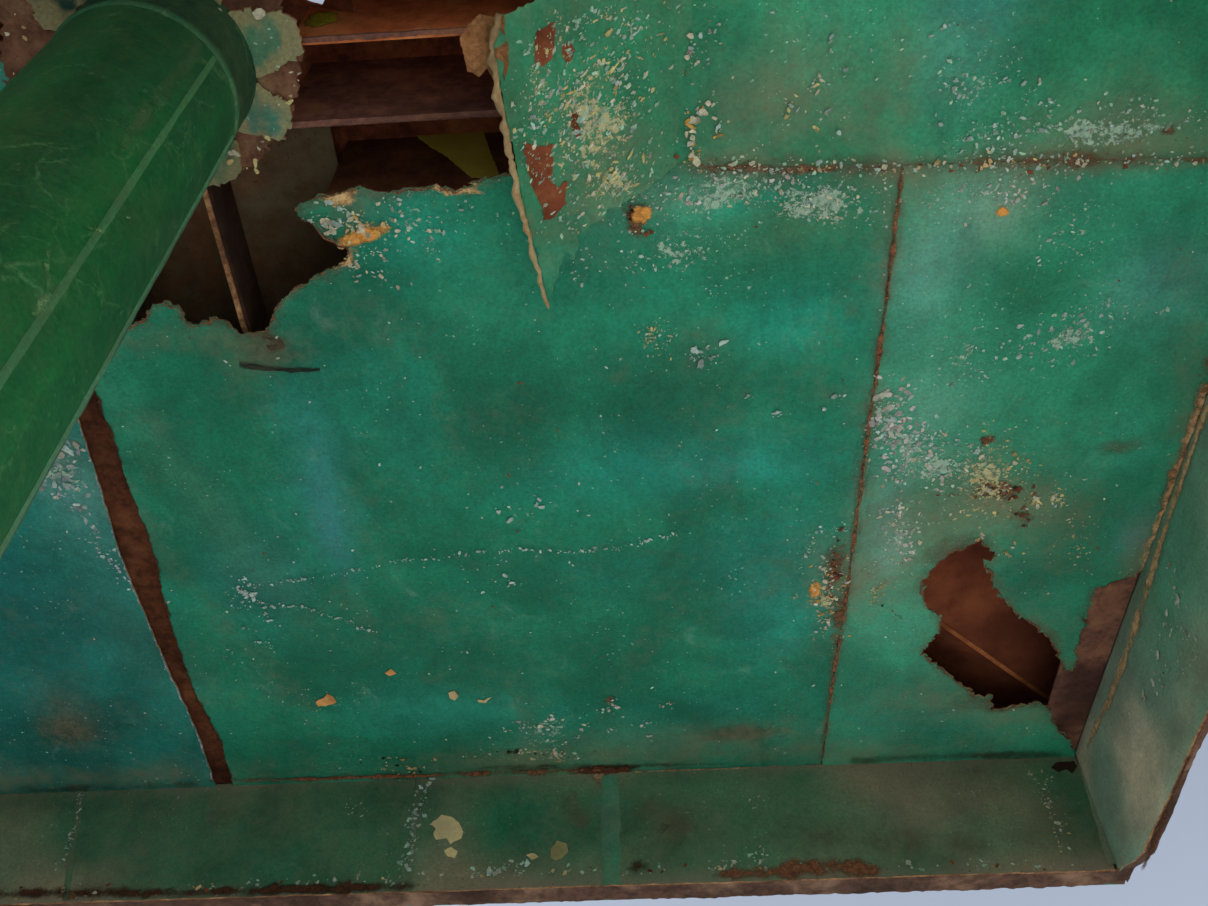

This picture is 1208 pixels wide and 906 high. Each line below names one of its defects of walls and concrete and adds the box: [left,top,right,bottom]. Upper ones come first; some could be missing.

peeling [252,8,266,20]
rust [535,21,575,67]
peeling [227,136,270,174]
rust [244,222,389,336]
peeling [302,193,475,290]
rust [94,390,777,783]
rust [1088,384,1208,745]
rust [0,880,413,899]
peeling [380,756,463,886]
peeling [470,841,598,878]
peeling [708,845,802,873]
rust [1142,756,1191,869]